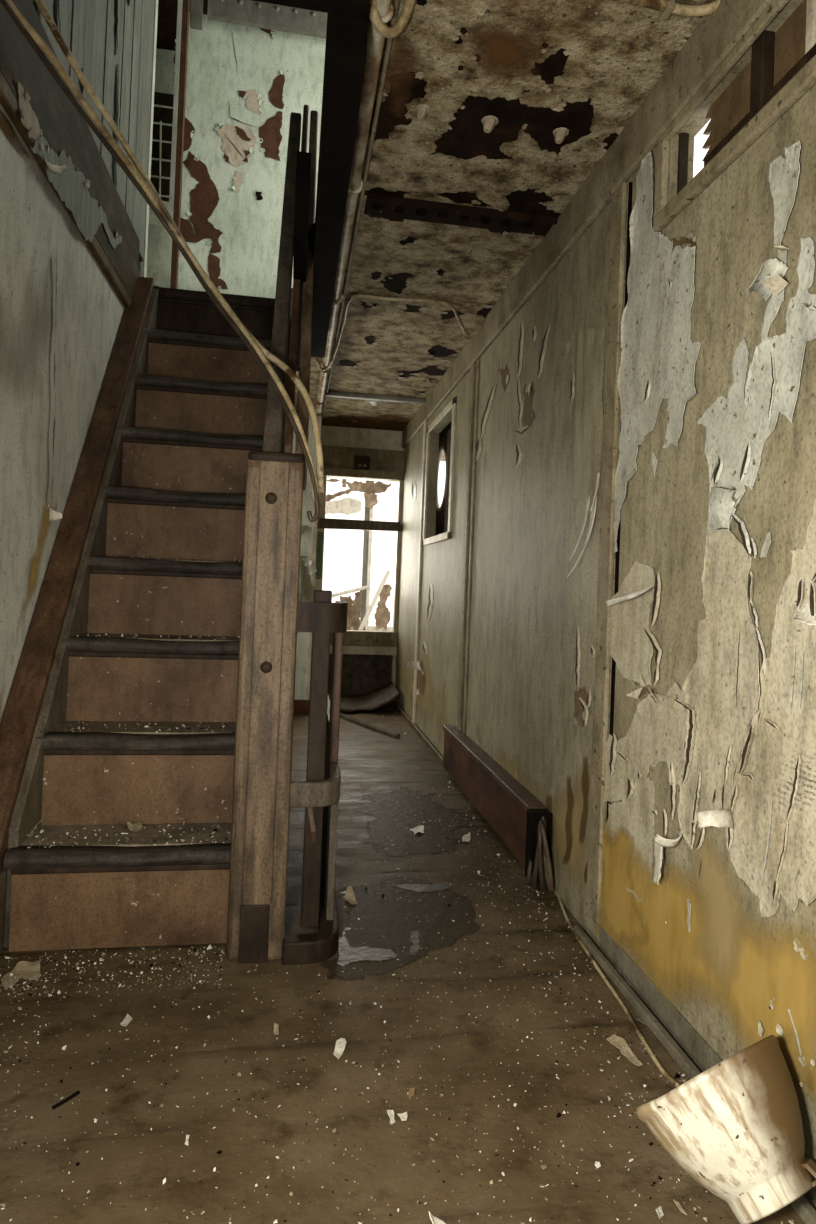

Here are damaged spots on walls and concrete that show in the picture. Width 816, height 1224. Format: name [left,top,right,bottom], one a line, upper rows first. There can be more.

rust [0,110,22,151]
peeling [17,79,122,249]
peeling [180,117,228,291]
peeling [215,70,285,194]
spalling [369,72,428,141]
spalling [364,187,561,246]
spalling [429,43,624,163]
spalling [370,271,494,319]
spalling [396,345,457,395]
peeling [566,141,816,917]
peeling [344,886,357,905]
damp [497,757,816,1091]